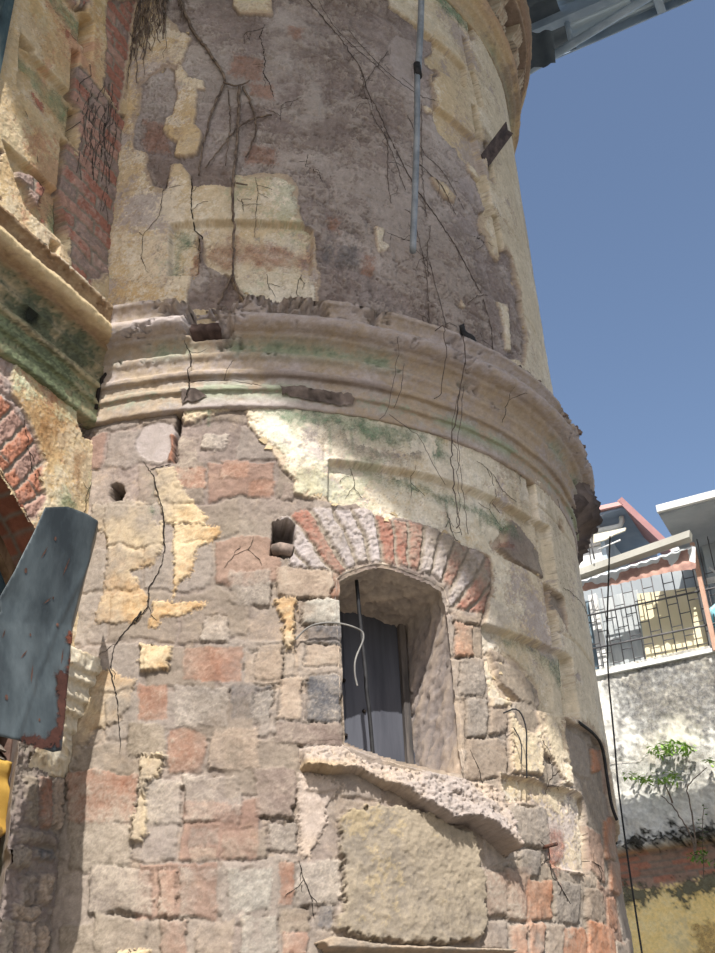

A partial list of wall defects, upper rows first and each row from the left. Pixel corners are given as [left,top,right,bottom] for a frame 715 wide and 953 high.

crack [244,28,299,120]
flaking render [12,0,526,364]
crack [183,340,260,401]
flaking render [0,357,47,522]
crack [99,464,171,747]
rust [18,631,73,749]
flaking render [47,411,634,953]
mould [616,817,715,852]
mould [622,867,715,910]